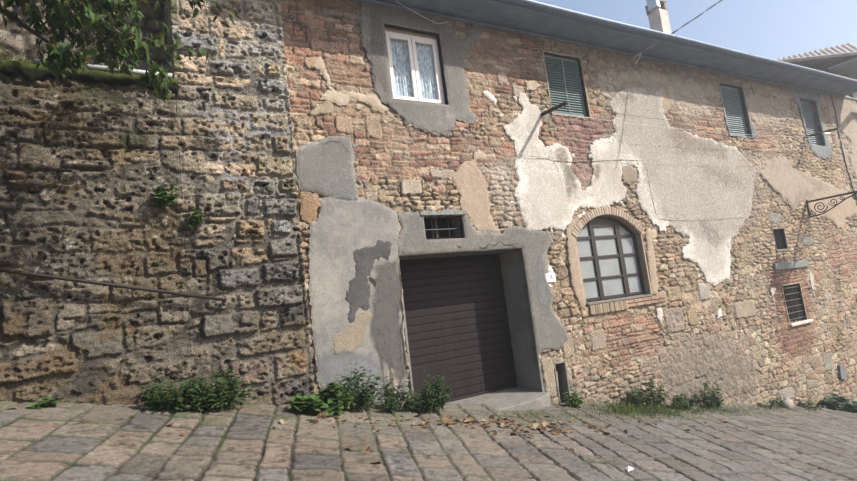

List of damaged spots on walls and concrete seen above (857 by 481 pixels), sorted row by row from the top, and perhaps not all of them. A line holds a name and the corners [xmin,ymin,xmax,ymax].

peeling [315,56,389,124]
peeling [447,67,857,286]
peeling [299,191,408,404]